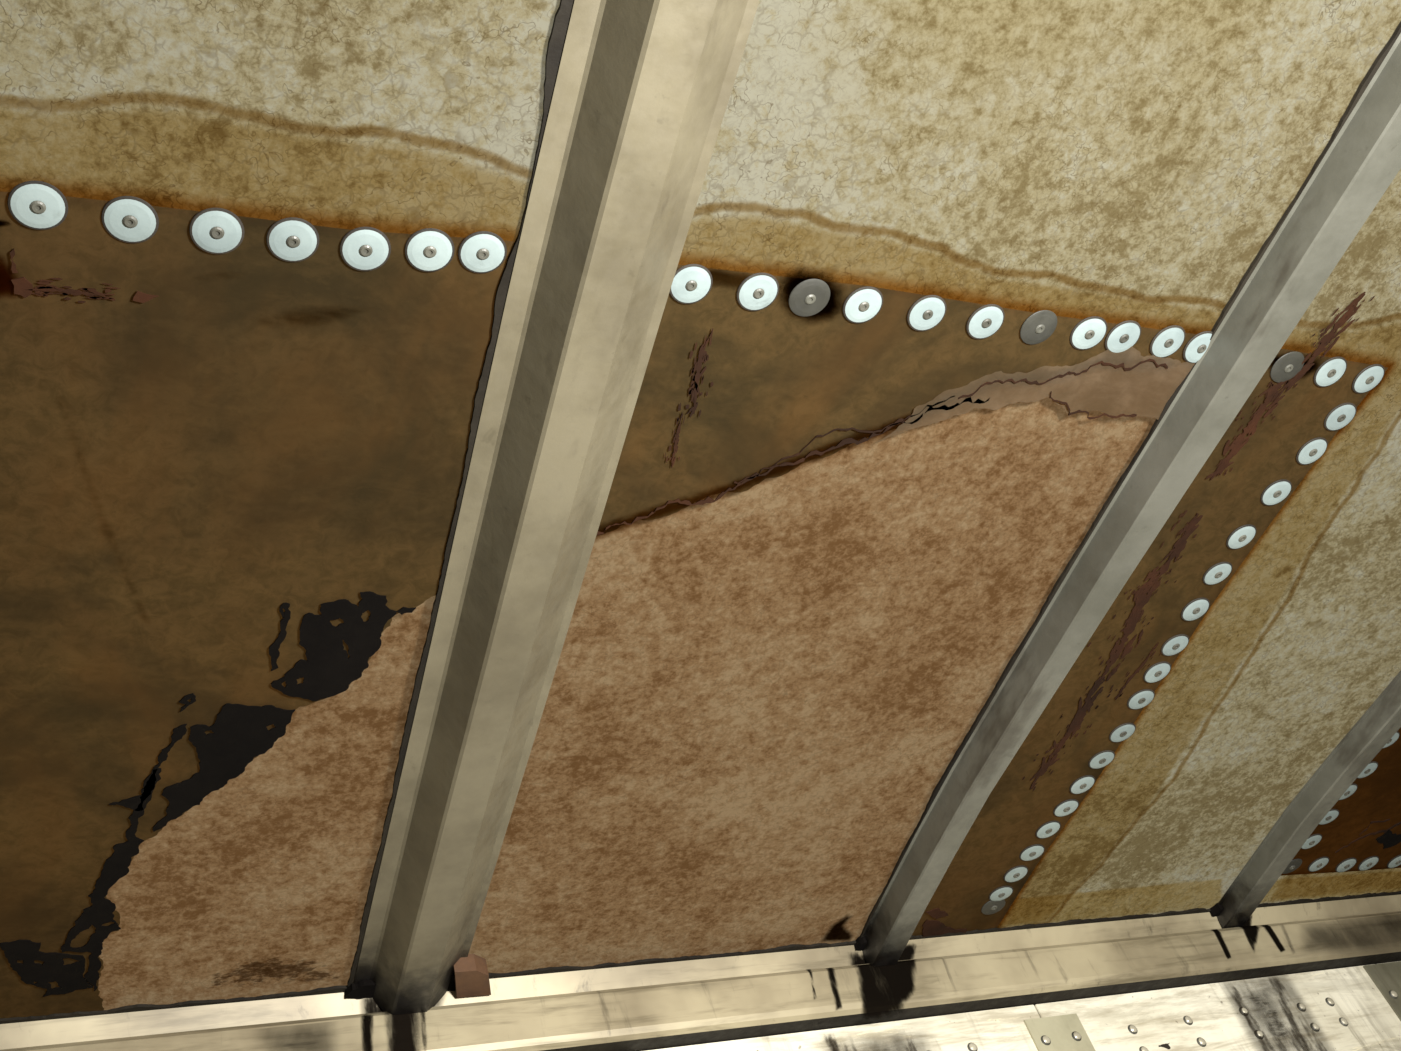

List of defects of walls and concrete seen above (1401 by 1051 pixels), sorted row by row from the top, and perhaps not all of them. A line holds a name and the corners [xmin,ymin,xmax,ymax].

corrosion [0,258,15,295]
crack [29,278,120,303]
crack [1206,292,1375,480]
crack [596,328,1168,537]
crack [1022,510,1203,791]
peeling [0,591,416,997]
peeling [922,908,967,937]
water stain [807,968,842,1009]
water stain [851,945,917,1019]